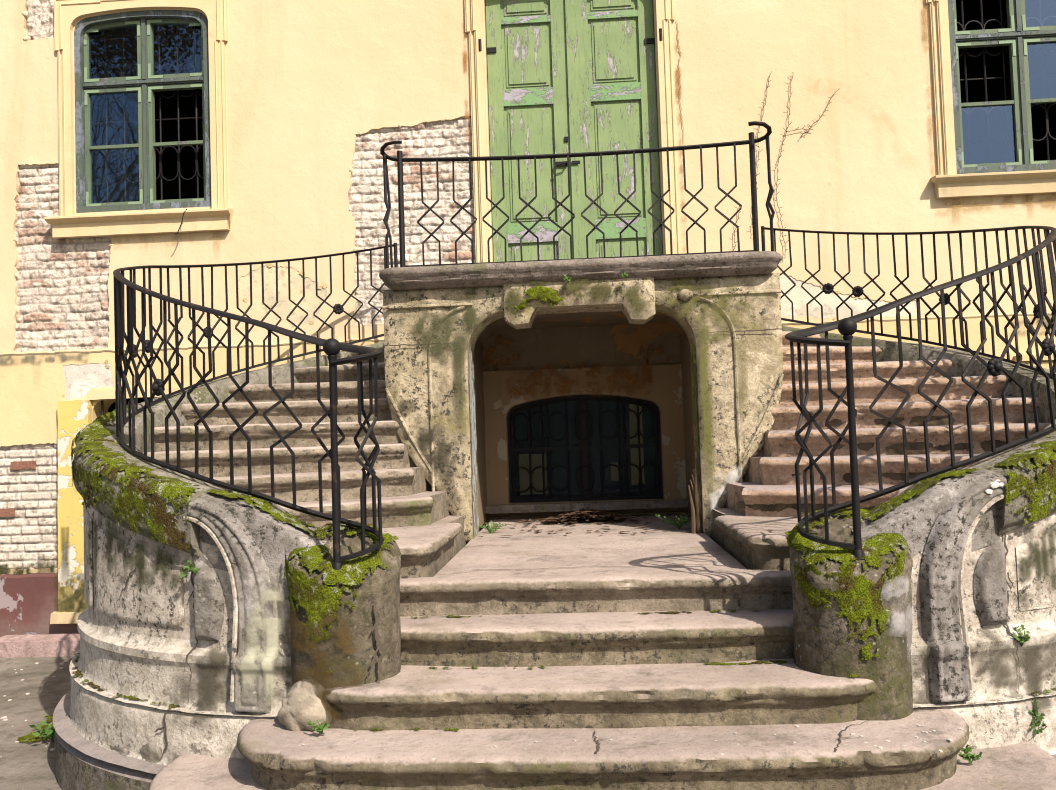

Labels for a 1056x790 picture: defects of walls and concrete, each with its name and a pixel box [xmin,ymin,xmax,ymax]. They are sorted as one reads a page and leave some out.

flaking render [22,0,54,41]
flaking render [13,162,114,400]
flaking render [348,116,476,326]
flaking render [0,443,58,570]
crack [593,730,603,753]
crack [834,719,873,751]